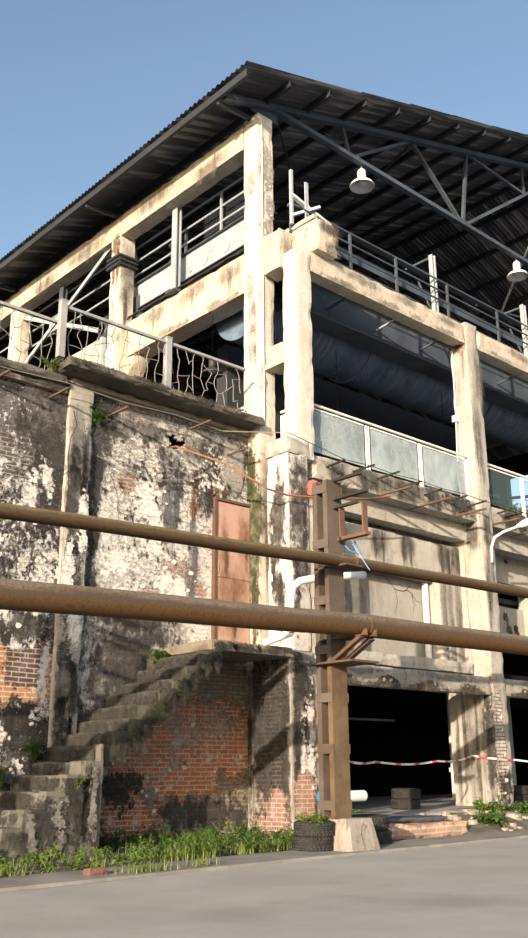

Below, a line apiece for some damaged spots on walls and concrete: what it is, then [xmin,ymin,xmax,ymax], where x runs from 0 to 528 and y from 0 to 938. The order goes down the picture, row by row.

leakage [72,357,118,377]
spalling [0,378,65,509]
peeling [0,519,88,585]
leakage [0,519,207,597]
leakage [0,367,254,533]
peeling [96,534,212,598]
peeling [104,432,248,533]
leakage [263,453,309,550]
leakage [266,557,310,608]
flaking render [0,610,84,791]
leakage [0,610,314,862]
flaking render [253,653,317,839]